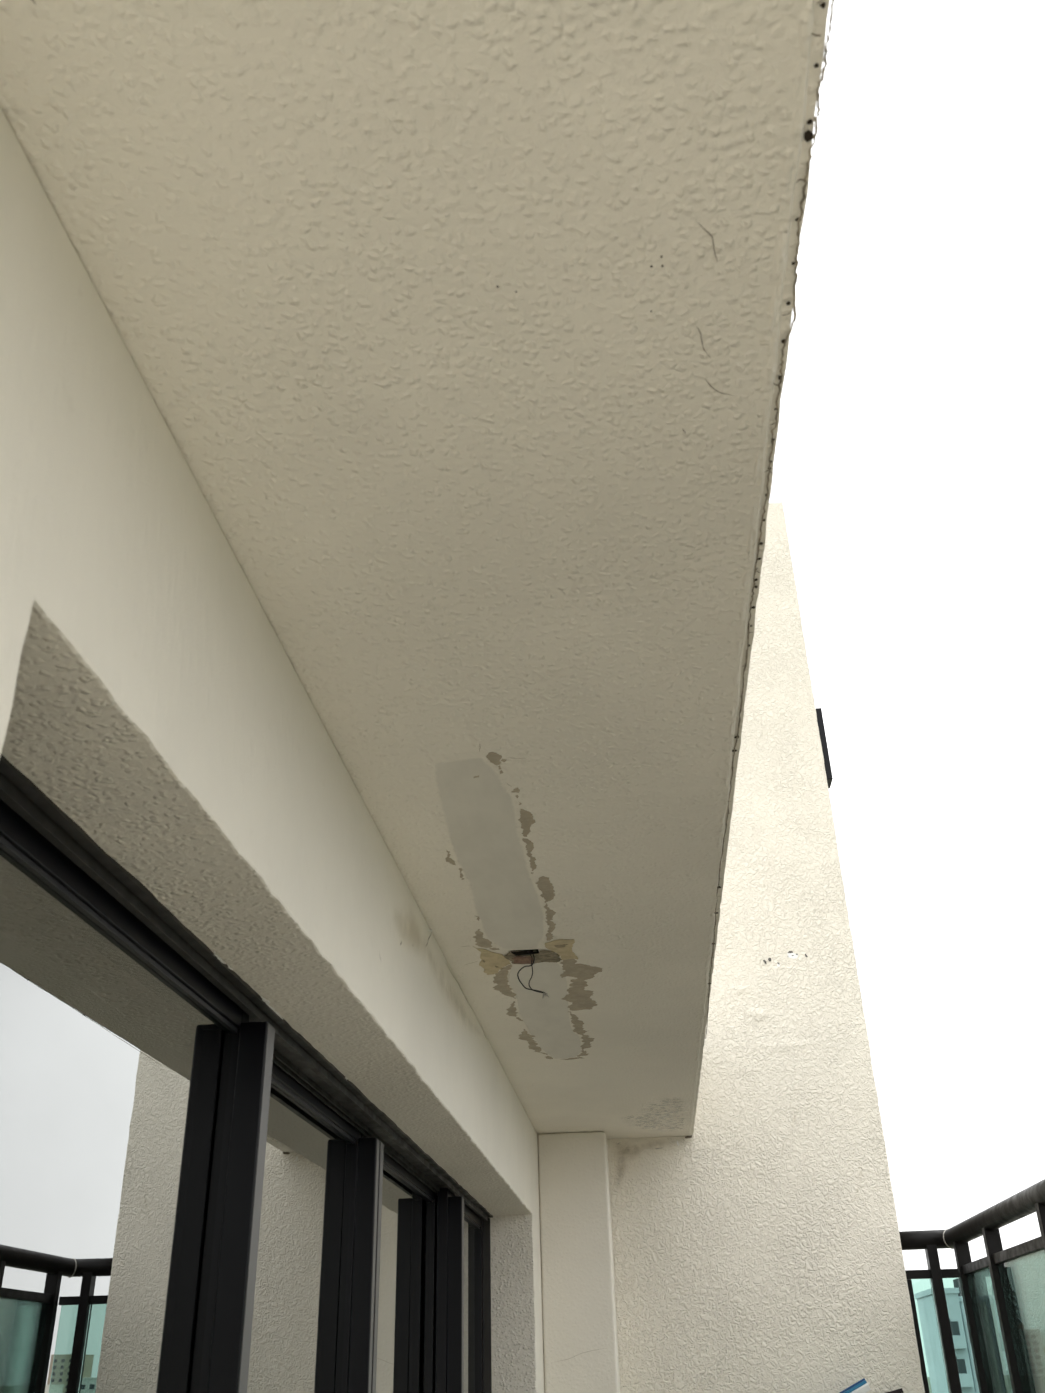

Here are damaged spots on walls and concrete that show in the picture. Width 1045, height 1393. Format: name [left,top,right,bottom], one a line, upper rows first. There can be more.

peeling [429,752,602,1060]